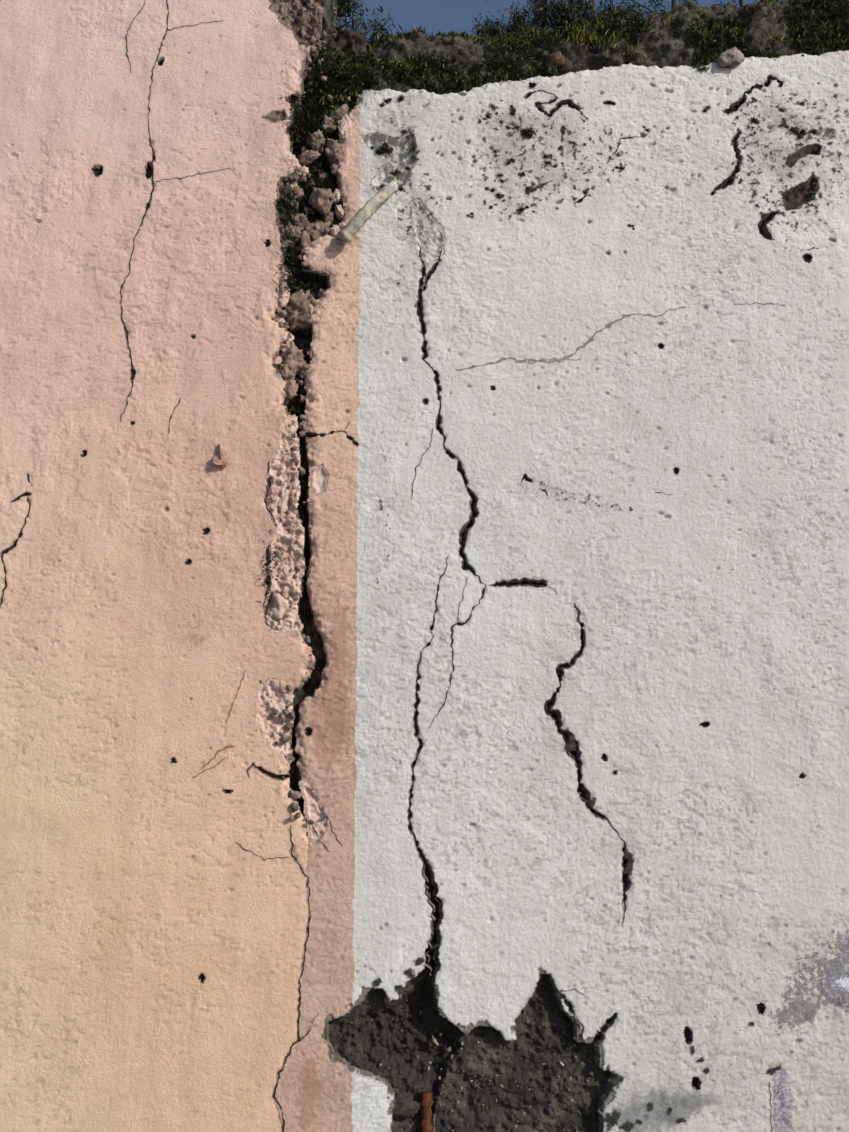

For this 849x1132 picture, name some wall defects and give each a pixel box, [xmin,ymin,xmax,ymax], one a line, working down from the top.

crack [120,0,230,422]
flaking render [264,172,299,255]
flaking render [804,127,835,140]
crack [0,474,33,607]
crack [235,0,367,1132]
crack [408,243,687,976]
flaking render [328,944,612,1132]
crack [556,988,618,1047]